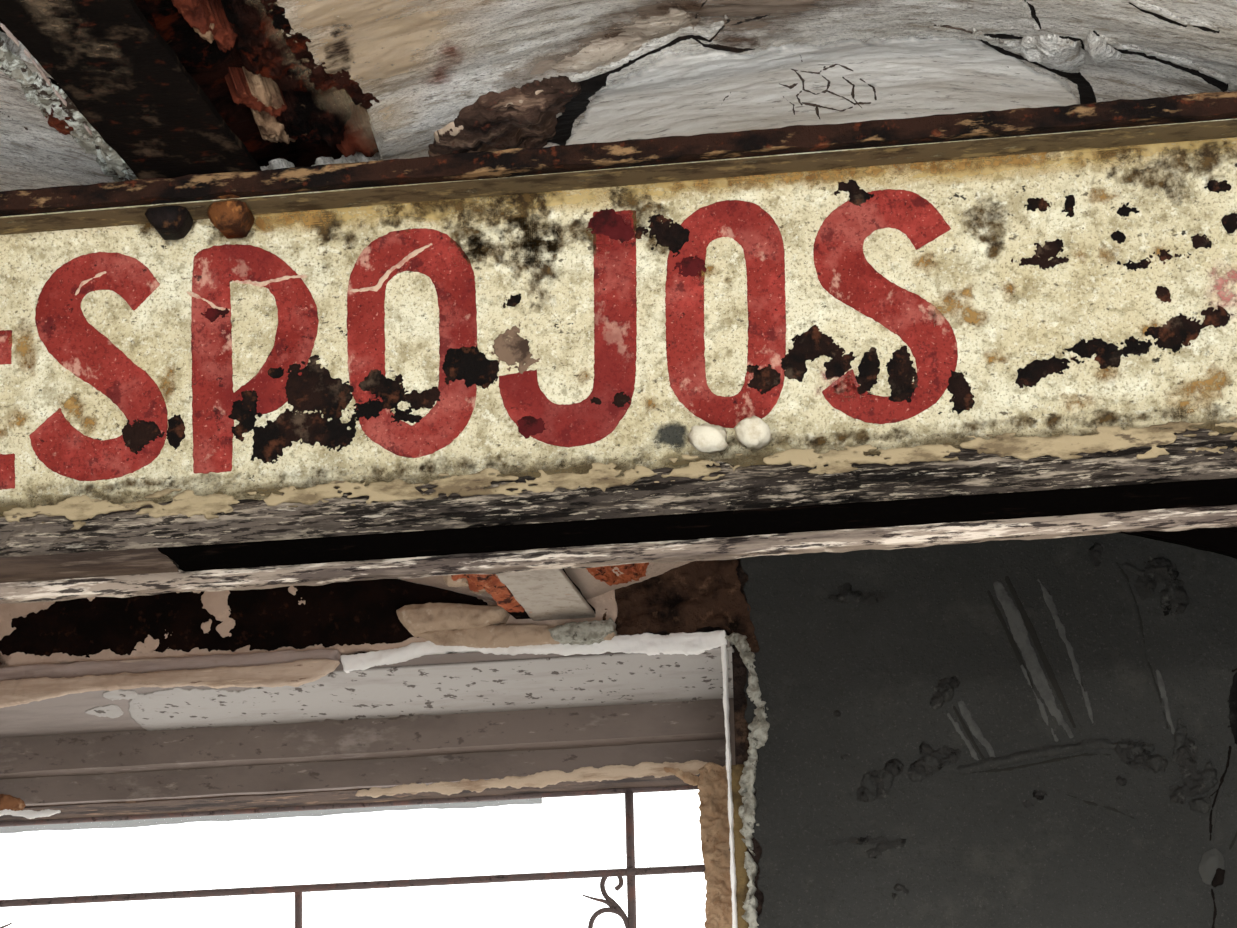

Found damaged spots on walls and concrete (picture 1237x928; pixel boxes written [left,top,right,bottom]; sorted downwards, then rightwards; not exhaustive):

spalling [172,0,379,158]
crack [569,0,768,85]
leakage [508,0,861,89]
crack [779,55,877,119]
crack [927,0,1228,104]
peeling [1011,239,1076,270]
peeling [1015,286,1230,388]
peeling [228,324,540,464]
peeling [0,574,525,658]
peeling [85,559,770,928]
crack [1190,743,1237,850]
crack [1210,889,1218,928]